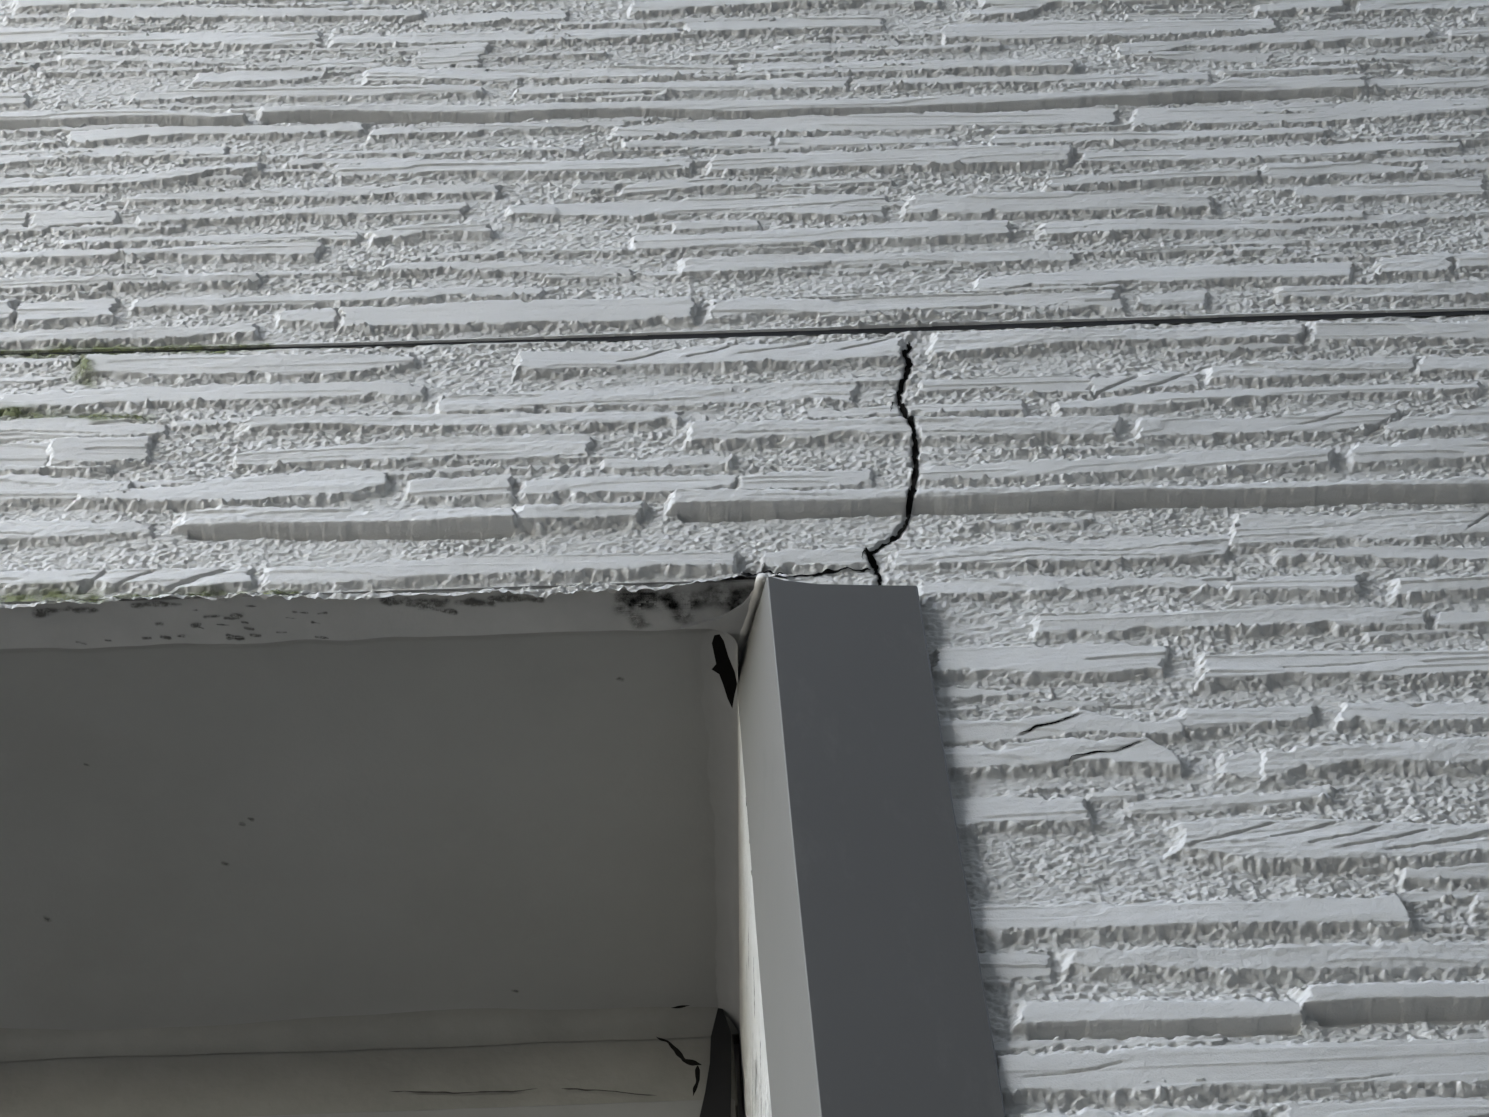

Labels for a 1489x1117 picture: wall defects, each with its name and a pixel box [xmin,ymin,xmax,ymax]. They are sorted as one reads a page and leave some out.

crack [765,342,919,585]
crack [712,634,737,708]
crack [657,1005,701,1095]